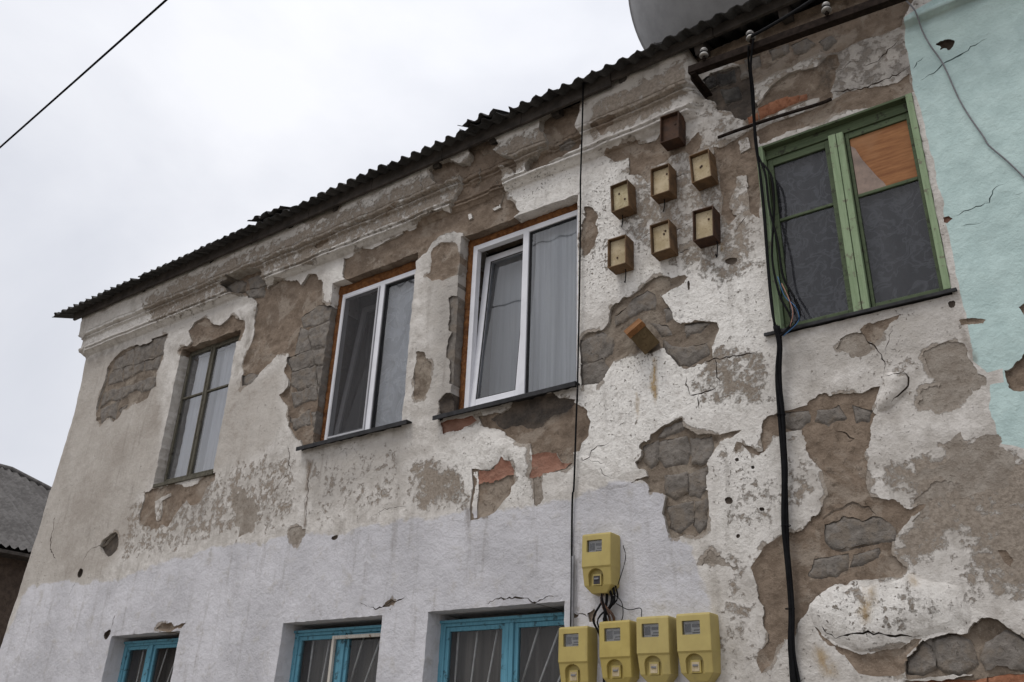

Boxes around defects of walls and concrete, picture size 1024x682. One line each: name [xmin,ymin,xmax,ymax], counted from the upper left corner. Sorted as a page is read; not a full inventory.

crack [831,38,987,93]
spalling [96,333,168,425]
spalling [178,266,337,451]
flaking render [342,102,616,506]
spalling [579,275,719,386]
crack [860,330,909,401]
flaking render [918,341,987,412]
flaking render [139,472,216,530]
flaking render [470,457,515,520]
flaking render [631,386,1015,673]
crack [486,596,591,616]
spalling [815,617,1024,682]